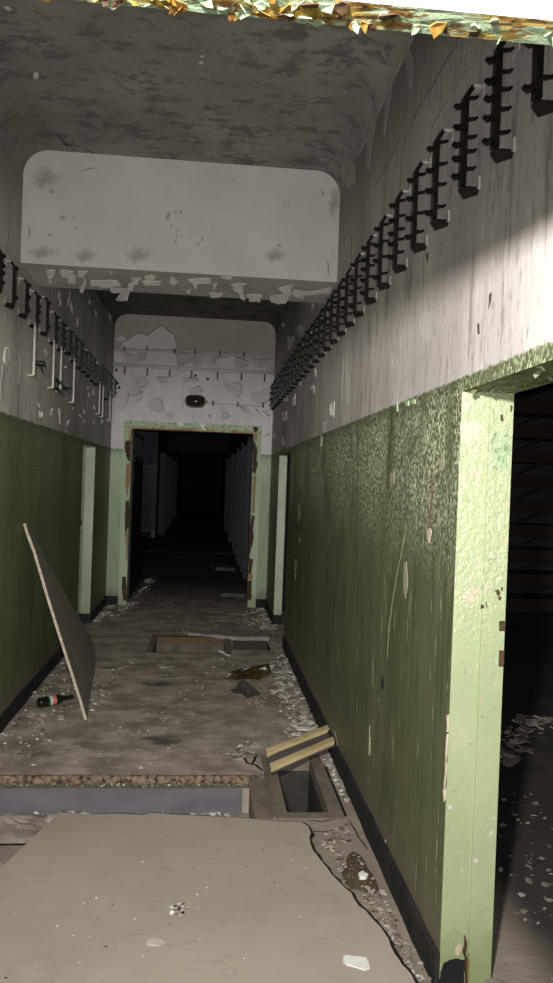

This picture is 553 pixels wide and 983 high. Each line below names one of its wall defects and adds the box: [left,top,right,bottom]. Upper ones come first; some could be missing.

peeling [94,0,189,16]
peeling [198,0,400,34]
peeling [404,22,451,88]
peeling [468,18,499,38]
peeling [46,270,332,330]
peeling [37,386,103,425]
peeling [114,325,190,421]
peeling [224,354,317,422]
peeling [460,362,553,454]
crack [307,819,368,850]
spalling [295,821,424,983]
crack [461,935,469,983]